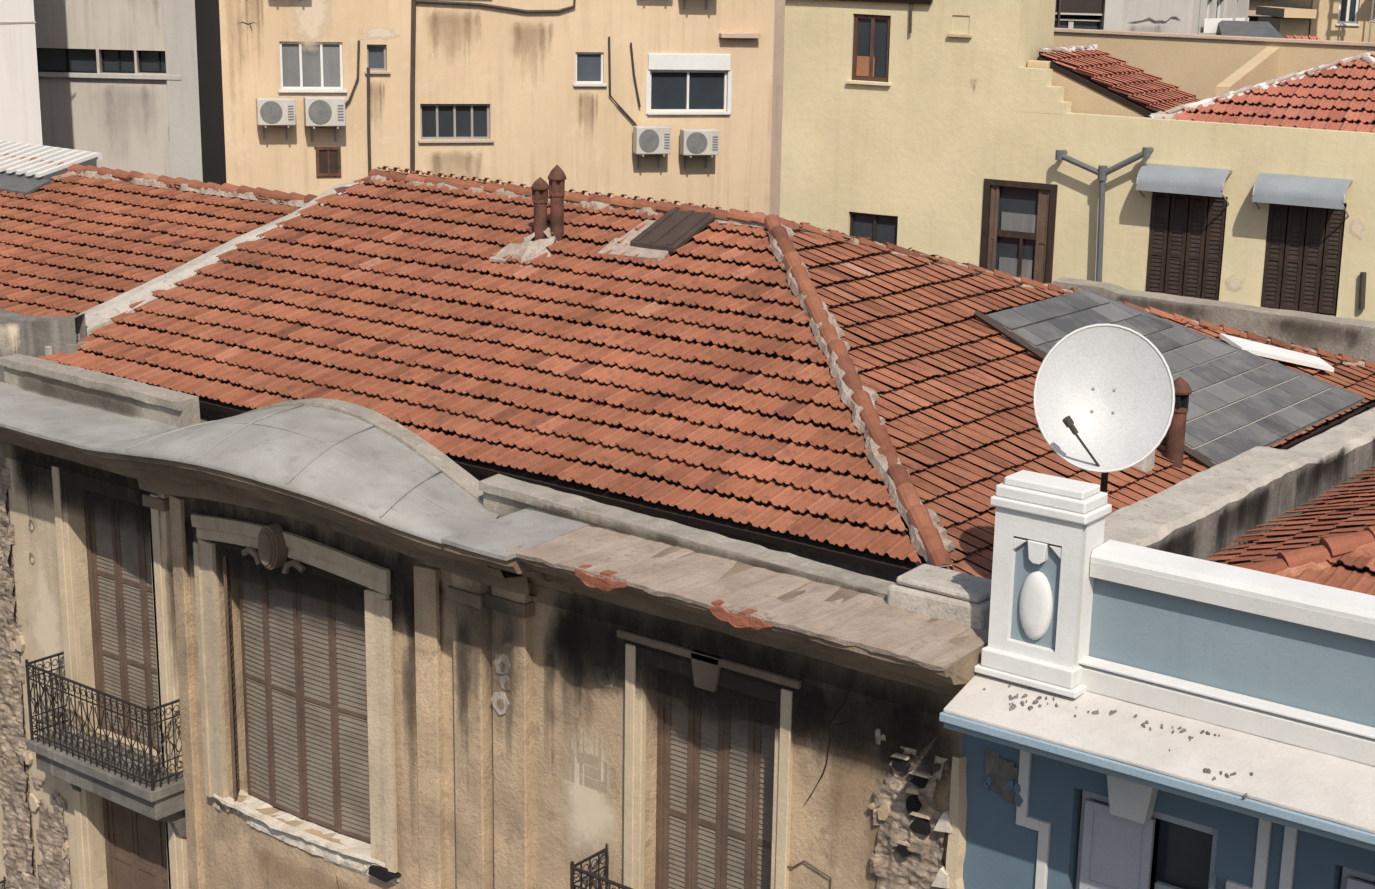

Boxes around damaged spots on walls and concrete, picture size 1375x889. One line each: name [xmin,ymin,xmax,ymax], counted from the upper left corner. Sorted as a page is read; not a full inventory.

crack [1130,15,1180,23]
water stain [1300,449,1346,492]
water stain [1154,531,1194,556]
water stain [1221,489,1269,546]
peeling [578,565,631,582]
peeling [711,599,778,621]
spalling [0,467,72,889]
water stain [405,591,416,724]
water stain [459,600,511,704]
water stain [564,738,617,851]
spalling [868,729,1023,889]